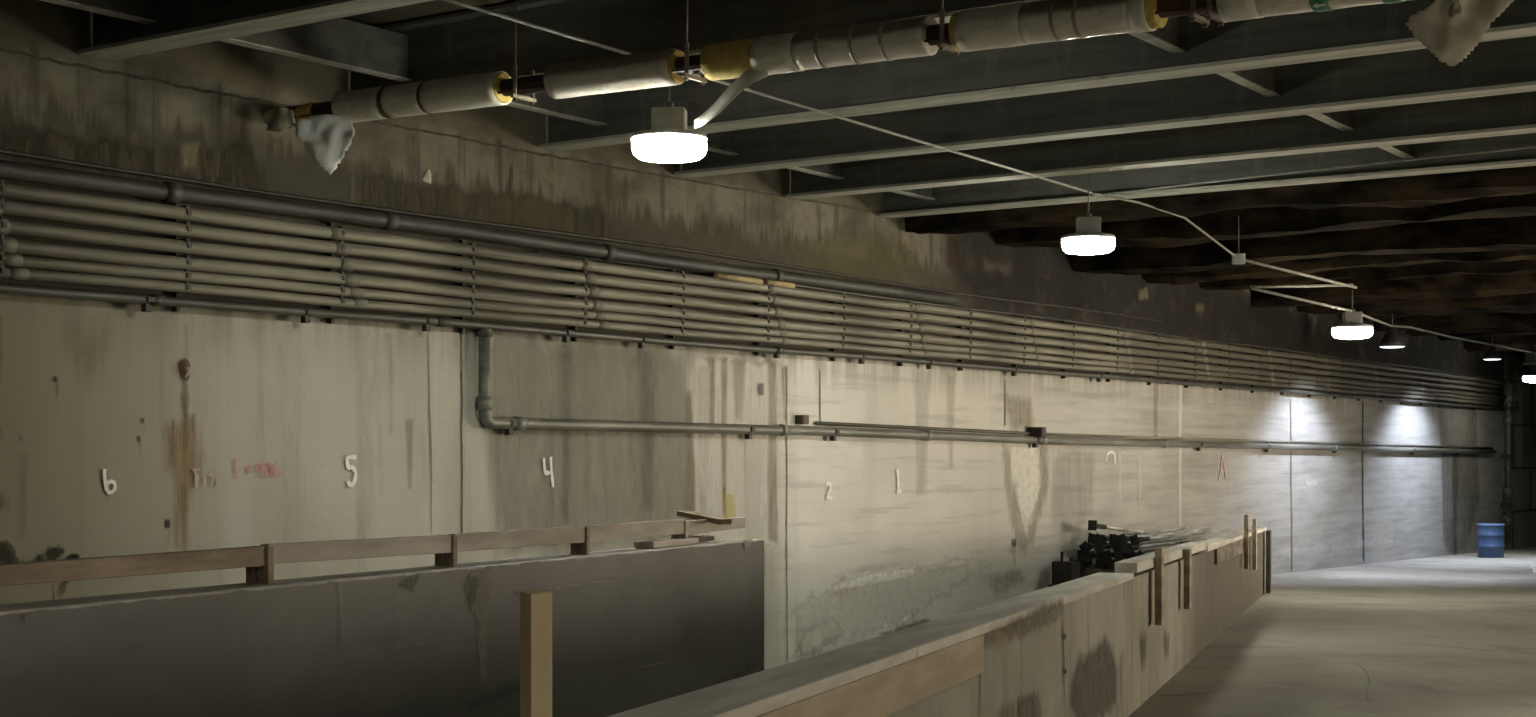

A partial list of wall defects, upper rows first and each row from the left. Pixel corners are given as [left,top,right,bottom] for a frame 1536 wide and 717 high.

rust [172,359,194,519]
leakage [1071,638,1146,717]